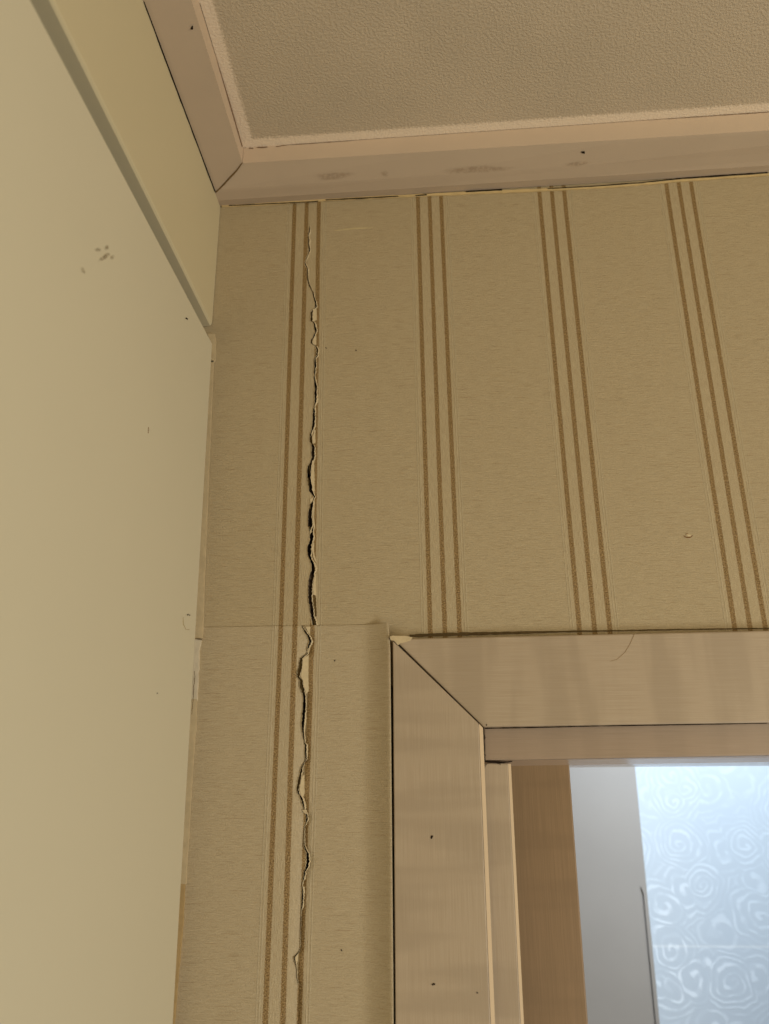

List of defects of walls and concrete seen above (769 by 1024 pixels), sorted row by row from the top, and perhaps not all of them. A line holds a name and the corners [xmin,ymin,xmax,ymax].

crack [293,226,320,985]